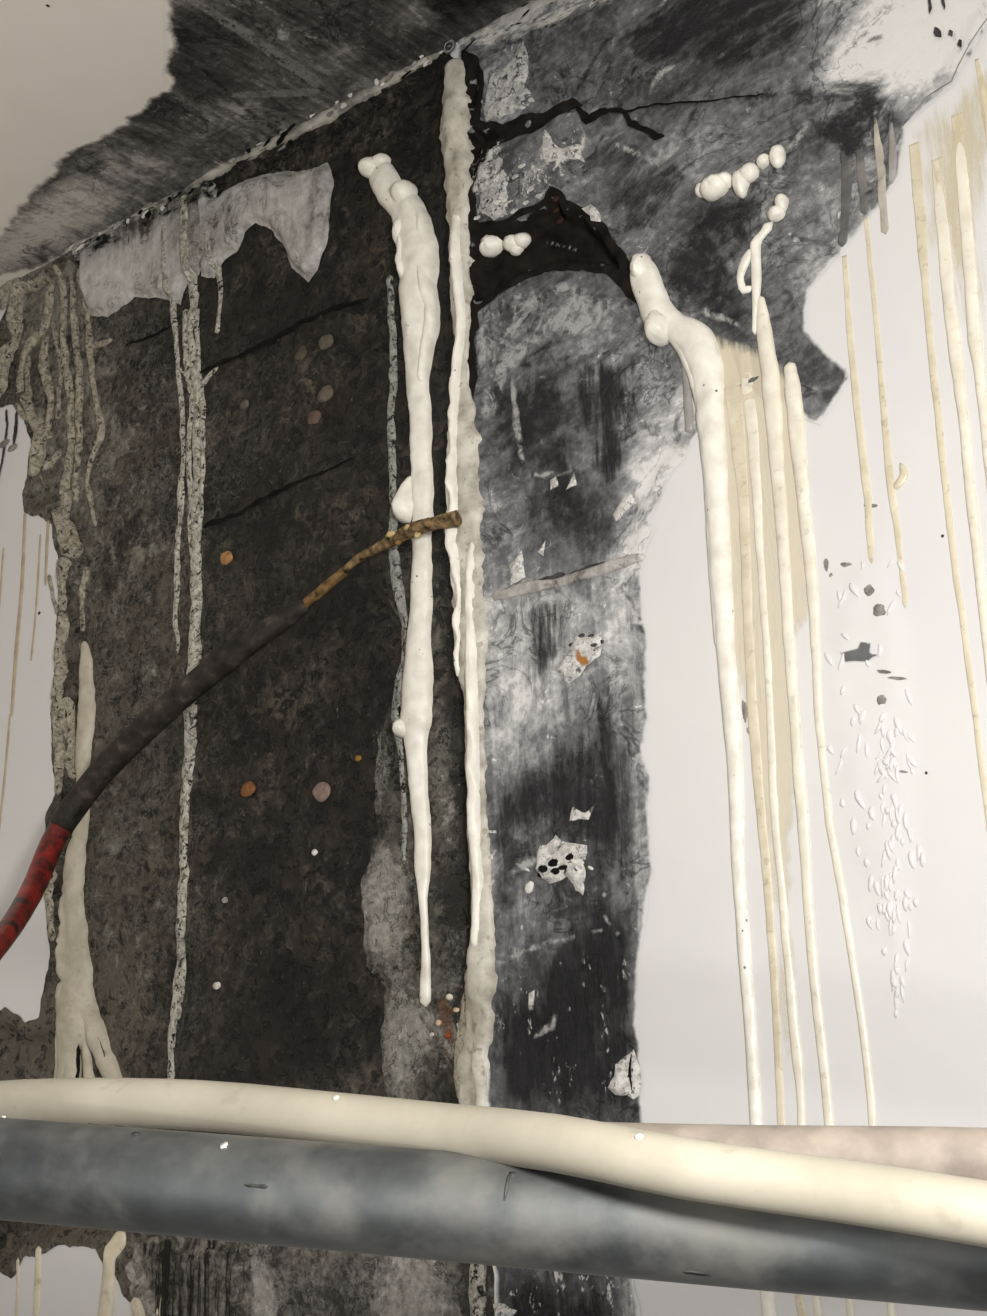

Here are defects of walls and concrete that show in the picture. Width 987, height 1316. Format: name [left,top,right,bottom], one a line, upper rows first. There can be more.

spalling [0,834,72,1081]
efflorescence [44,870,57,942]
efflorescence [0,259,113,795]
spalling [45,737,76,831]
spalling [148,1128,259,1149]
spalling [81,550,402,1100]
spalling [0,0,534,764]
spalling [0,1220,640,1316]
efflorescence [386,275,408,864]
peeling [455,0,987,1123]
water stain [717,342,807,897]
water stain [938,99,982,253]